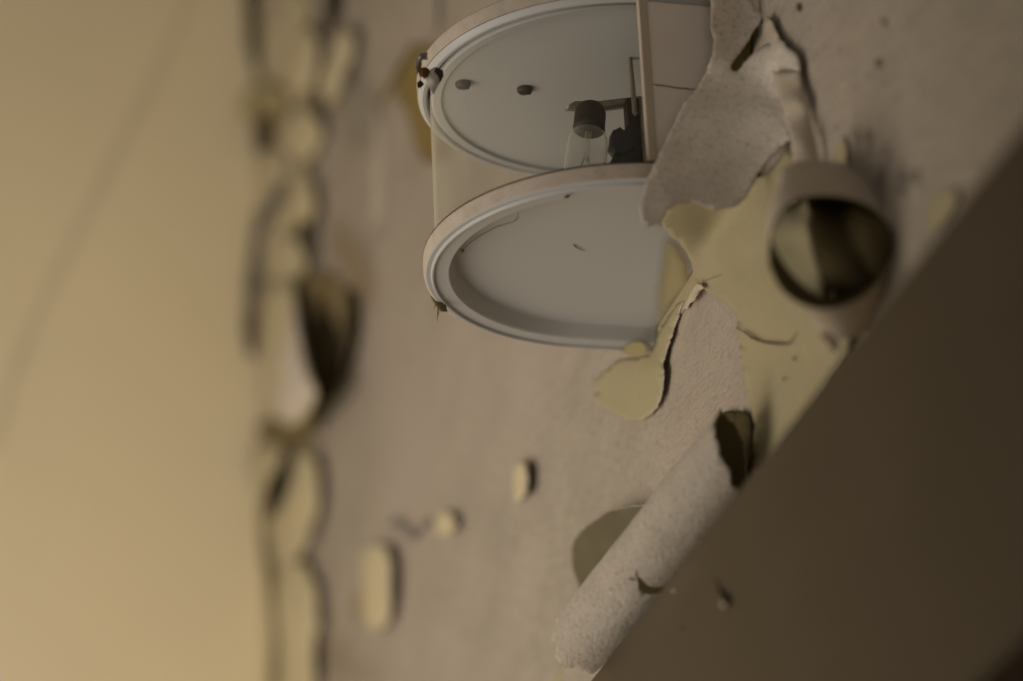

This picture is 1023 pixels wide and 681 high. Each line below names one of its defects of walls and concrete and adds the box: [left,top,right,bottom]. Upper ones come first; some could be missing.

peeling [592,0,849,470]
peeling [513,461,529,502]